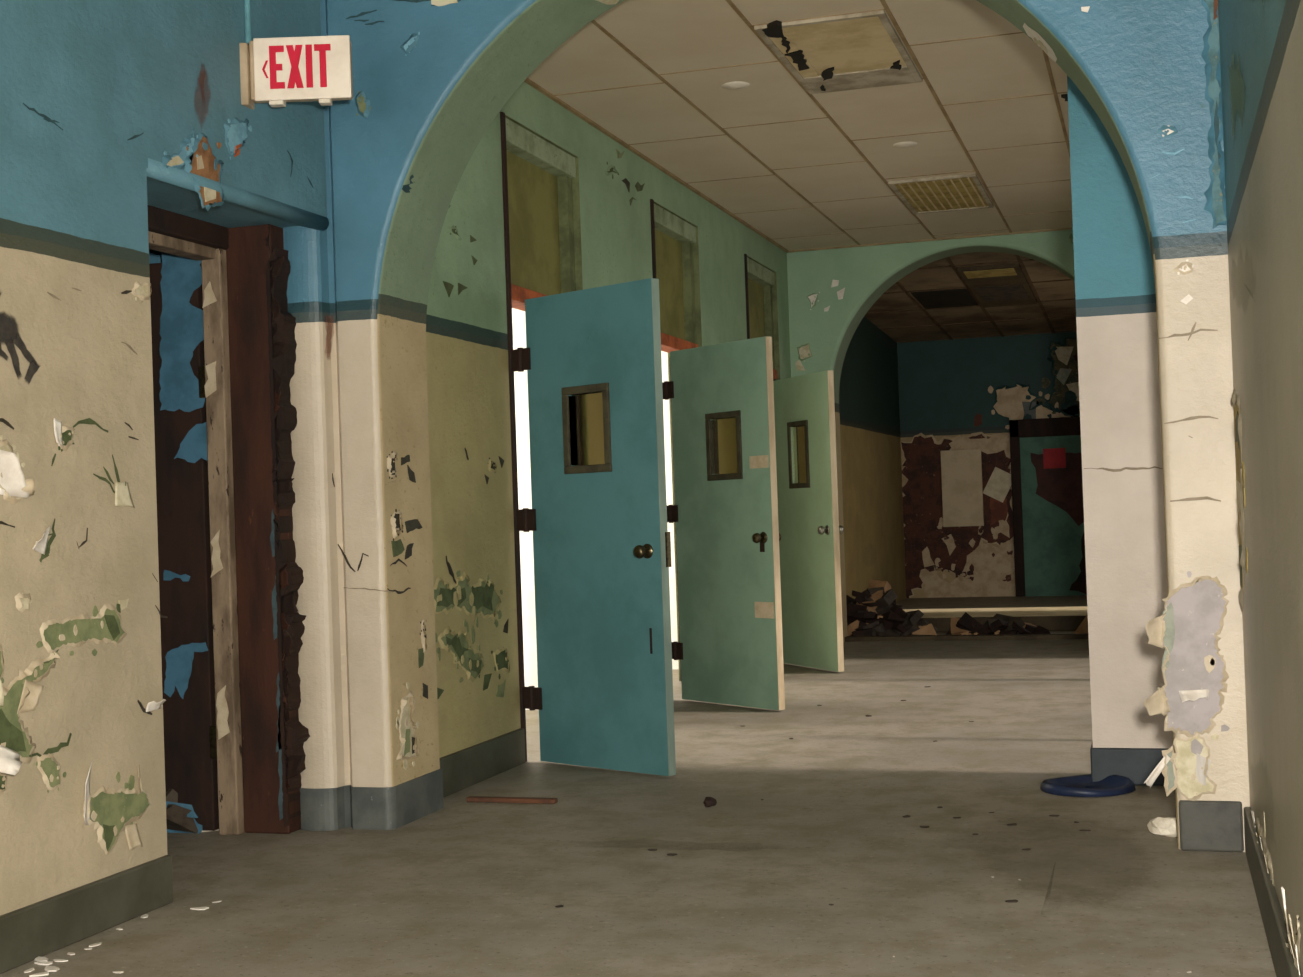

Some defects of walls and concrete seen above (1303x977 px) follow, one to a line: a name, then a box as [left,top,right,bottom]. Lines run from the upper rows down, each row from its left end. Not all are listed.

spalling [162,118,252,211]
crack [1159,322,1218,341]
peeling [0,435,35,505]
peeling [391,509,423,559]
peeling [901,337,1087,598]
crack [1084,465,1163,473]
crack [1164,416,1219,438]
crack [1170,495,1221,503]
spalling [1144,387,1248,801]
peeling [0,599,129,795]
peeling [396,570,510,770]
peeling [83,761,150,855]